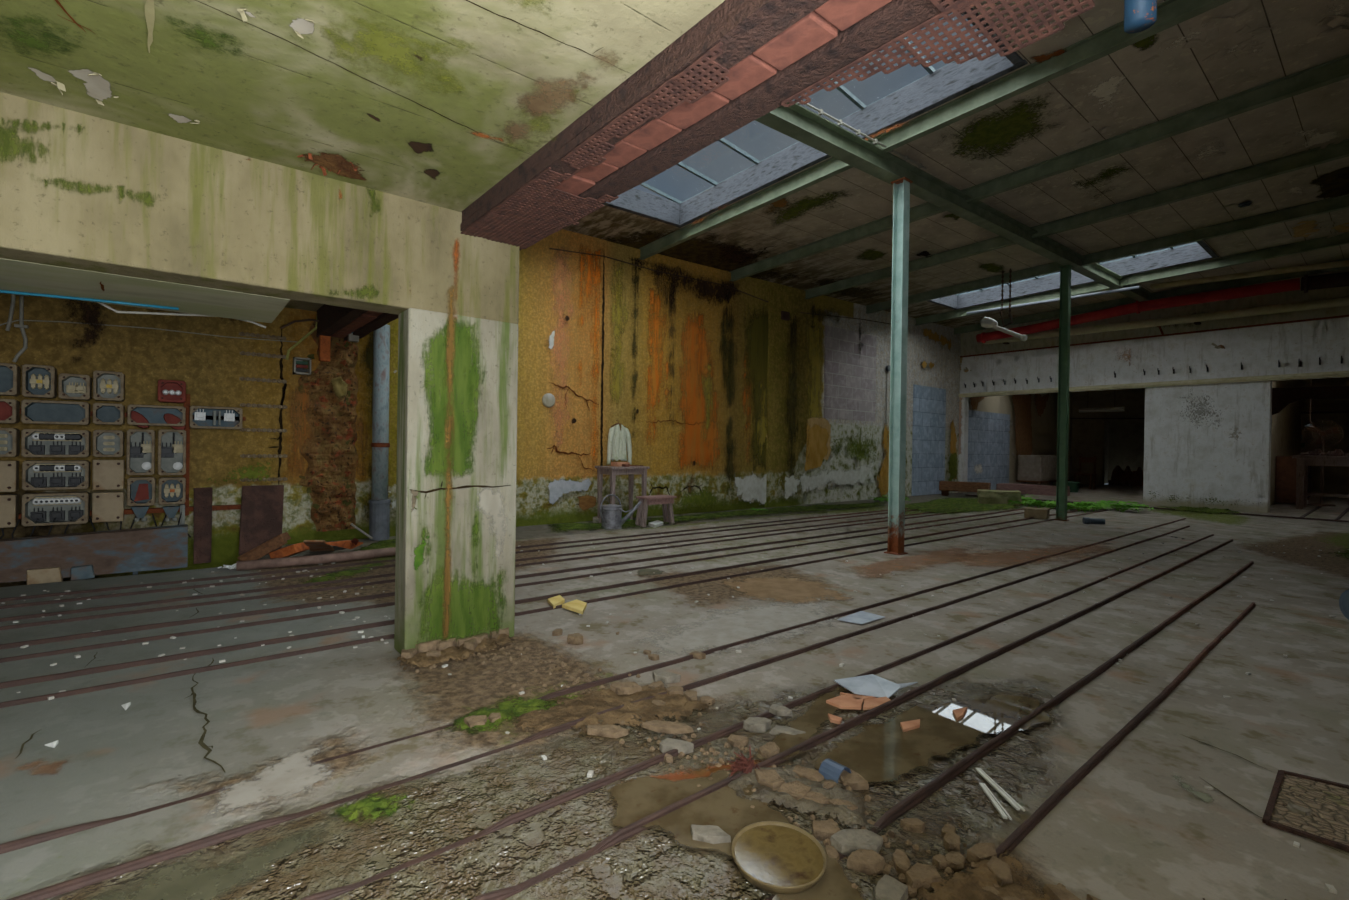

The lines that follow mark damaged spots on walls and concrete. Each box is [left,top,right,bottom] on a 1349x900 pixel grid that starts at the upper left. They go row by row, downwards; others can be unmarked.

flaking render [296,319,359,532]
water stain [422,287,473,637]
water stain [601,230,885,479]
peeling [735,473,767,505]
peeling [784,417,874,500]
crack [184,658,225,773]